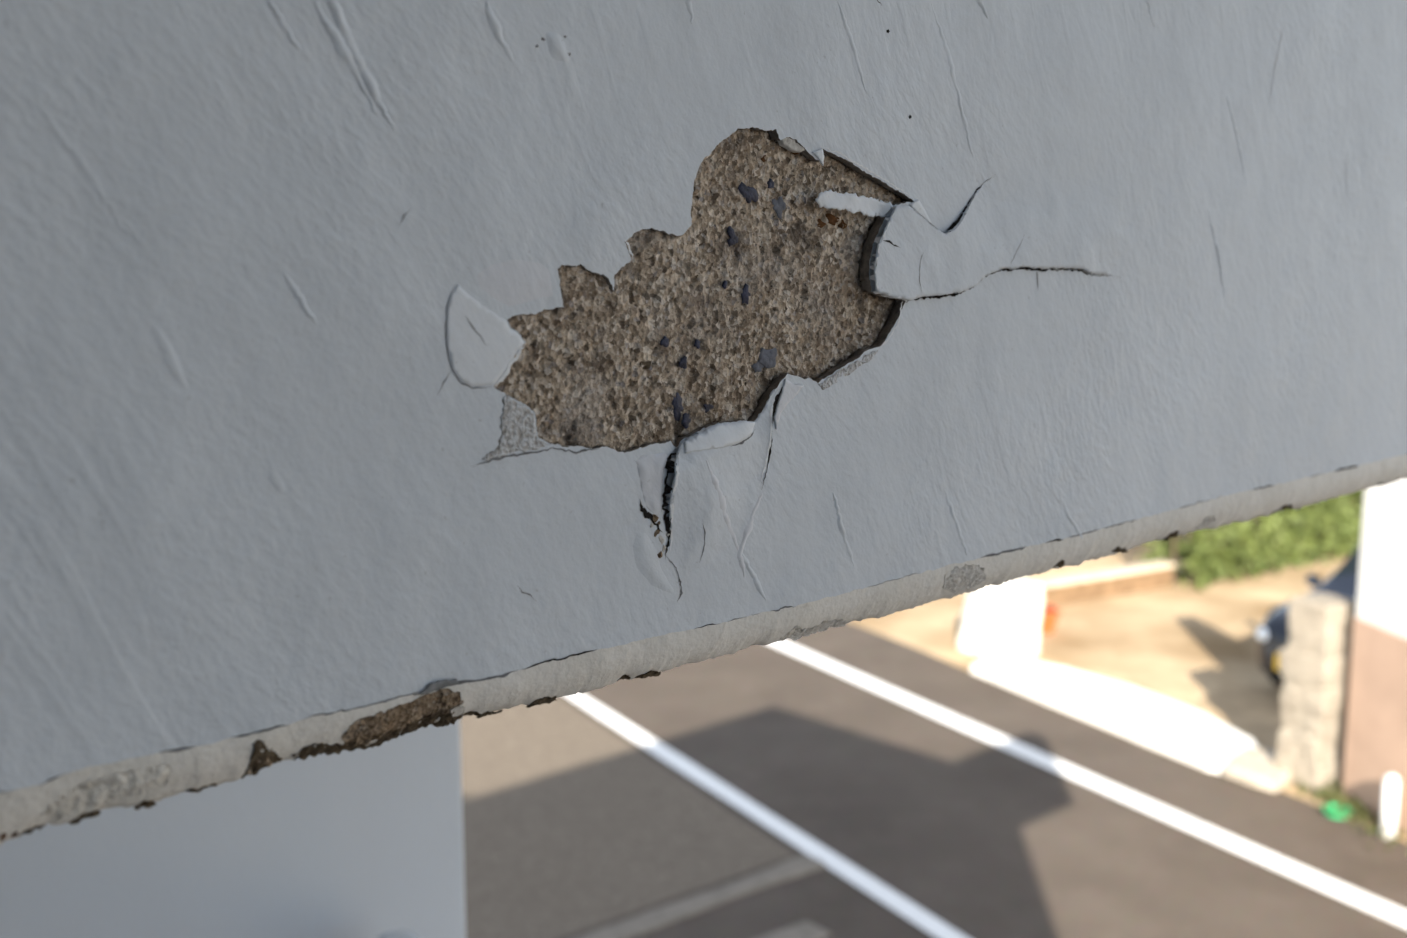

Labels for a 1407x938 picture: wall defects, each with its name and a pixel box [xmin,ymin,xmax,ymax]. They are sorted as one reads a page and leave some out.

crack [909,175,995,232]
crack [906,239,1114,303]
spalling [438,127,914,578]
crack [635,448,683,600]
crack [981,519,1138,558]
crack [695,606,796,629]
crack [231,649,597,738]
crack [159,745,196,753]
spalling [241,679,503,779]